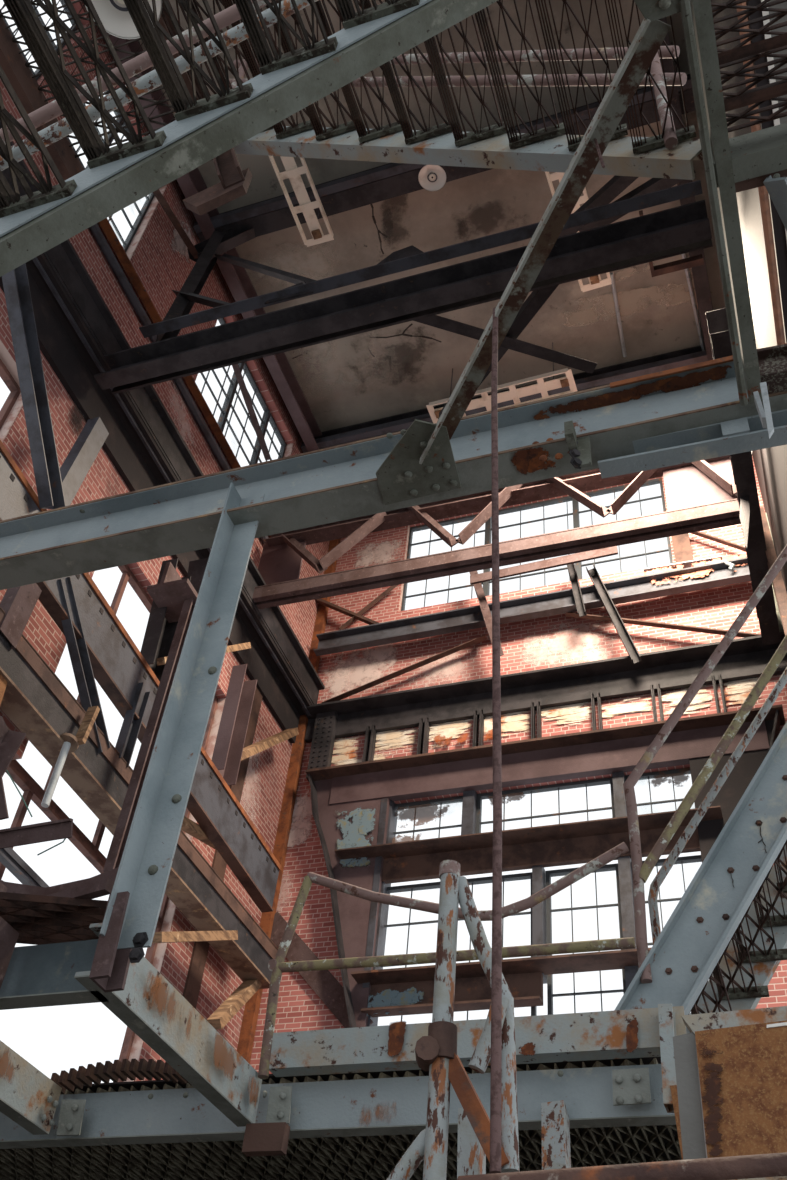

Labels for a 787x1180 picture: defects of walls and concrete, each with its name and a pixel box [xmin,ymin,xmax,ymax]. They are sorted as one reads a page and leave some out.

leakage [458,203,503,236]
corrosion [534,365,732,420]
corrosion [511,447,556,475]
peeling [336,807,376,867]
corrosion [149,973,191,1036]
corrosion [0,1049,14,1081]
corrosion [214,1034,235,1081]
corrosion [388,1021,406,1056]
corrosion [519,1042,535,1056]
corrosion [626,1015,638,1053]
corrosion [673,1006,787,1160]